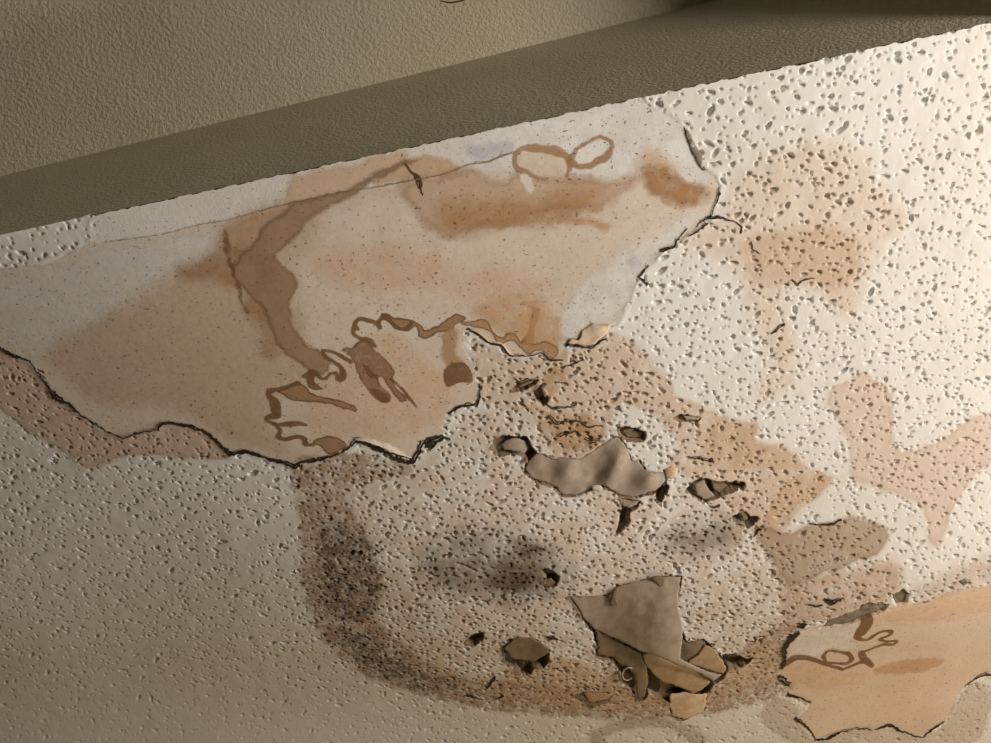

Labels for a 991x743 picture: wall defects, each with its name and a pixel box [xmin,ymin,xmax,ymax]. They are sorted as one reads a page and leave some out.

peeling [0,98,720,465]
damp [0,352,228,467]
damp [57,135,941,719]
damp [829,373,991,545]
peeling [780,578,991,739]